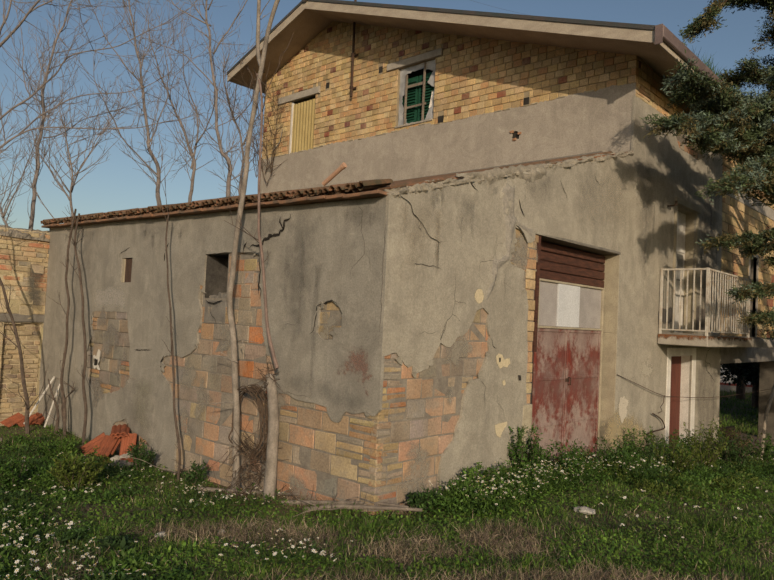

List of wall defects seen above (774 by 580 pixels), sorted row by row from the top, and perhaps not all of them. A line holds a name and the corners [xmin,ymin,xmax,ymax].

water stain [28,267,41,305]
crack [242,213,291,296]
crack [393,193,439,268]
flaking render [86,310,136,406]
flaking render [159,252,276,490]
flaking render [276,289,510,515]